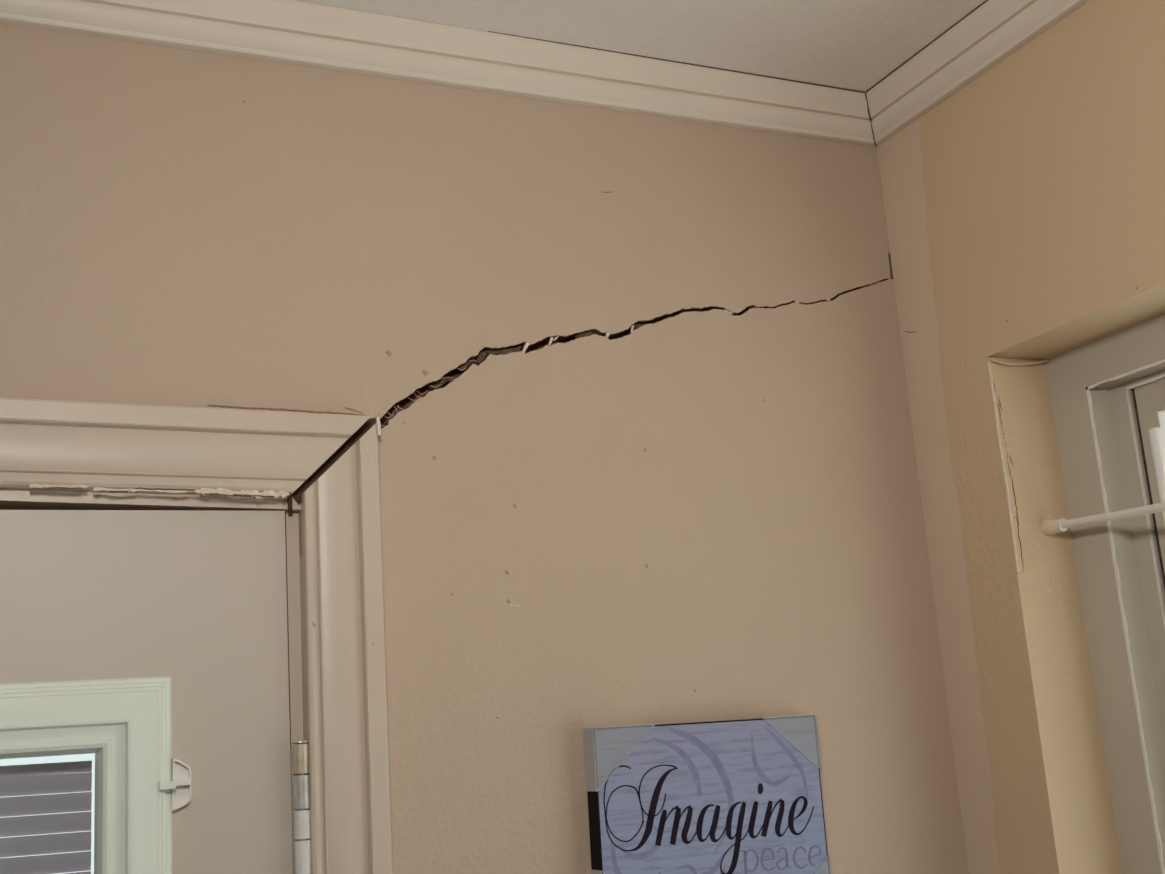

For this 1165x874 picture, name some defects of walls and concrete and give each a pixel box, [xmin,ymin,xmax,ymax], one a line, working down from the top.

crack [207,253,893,429]